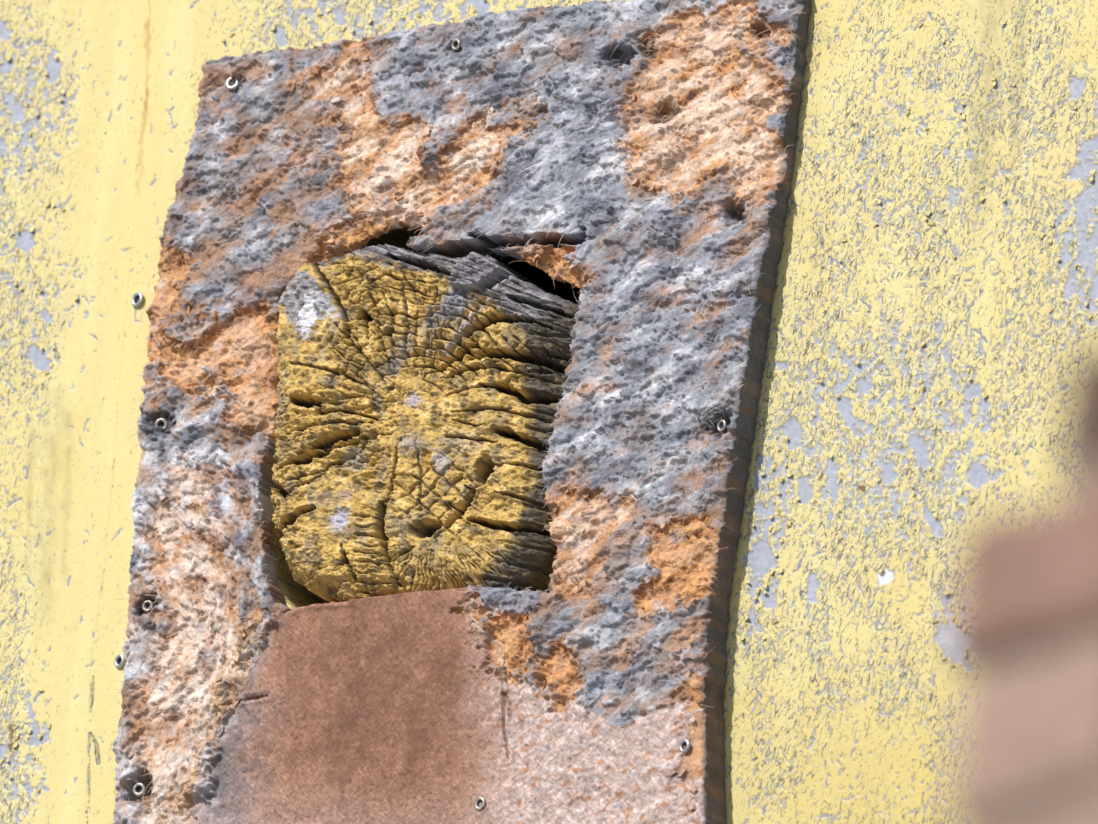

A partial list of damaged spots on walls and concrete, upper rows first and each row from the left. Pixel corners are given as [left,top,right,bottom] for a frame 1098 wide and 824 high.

peeling [0,3,78,206]
peeling [843,54,1032,255]
peeling [0,220,60,405]
crack [311,264,373,341]
crack [387,226,587,276]
crack [423,295,574,405]
peeling [1009,99,1098,389]
crack [274,396,378,538]
crack [444,428,549,453]
crack [444,486,551,537]
peeling [739,258,1033,667]
peeling [0,687,51,824]